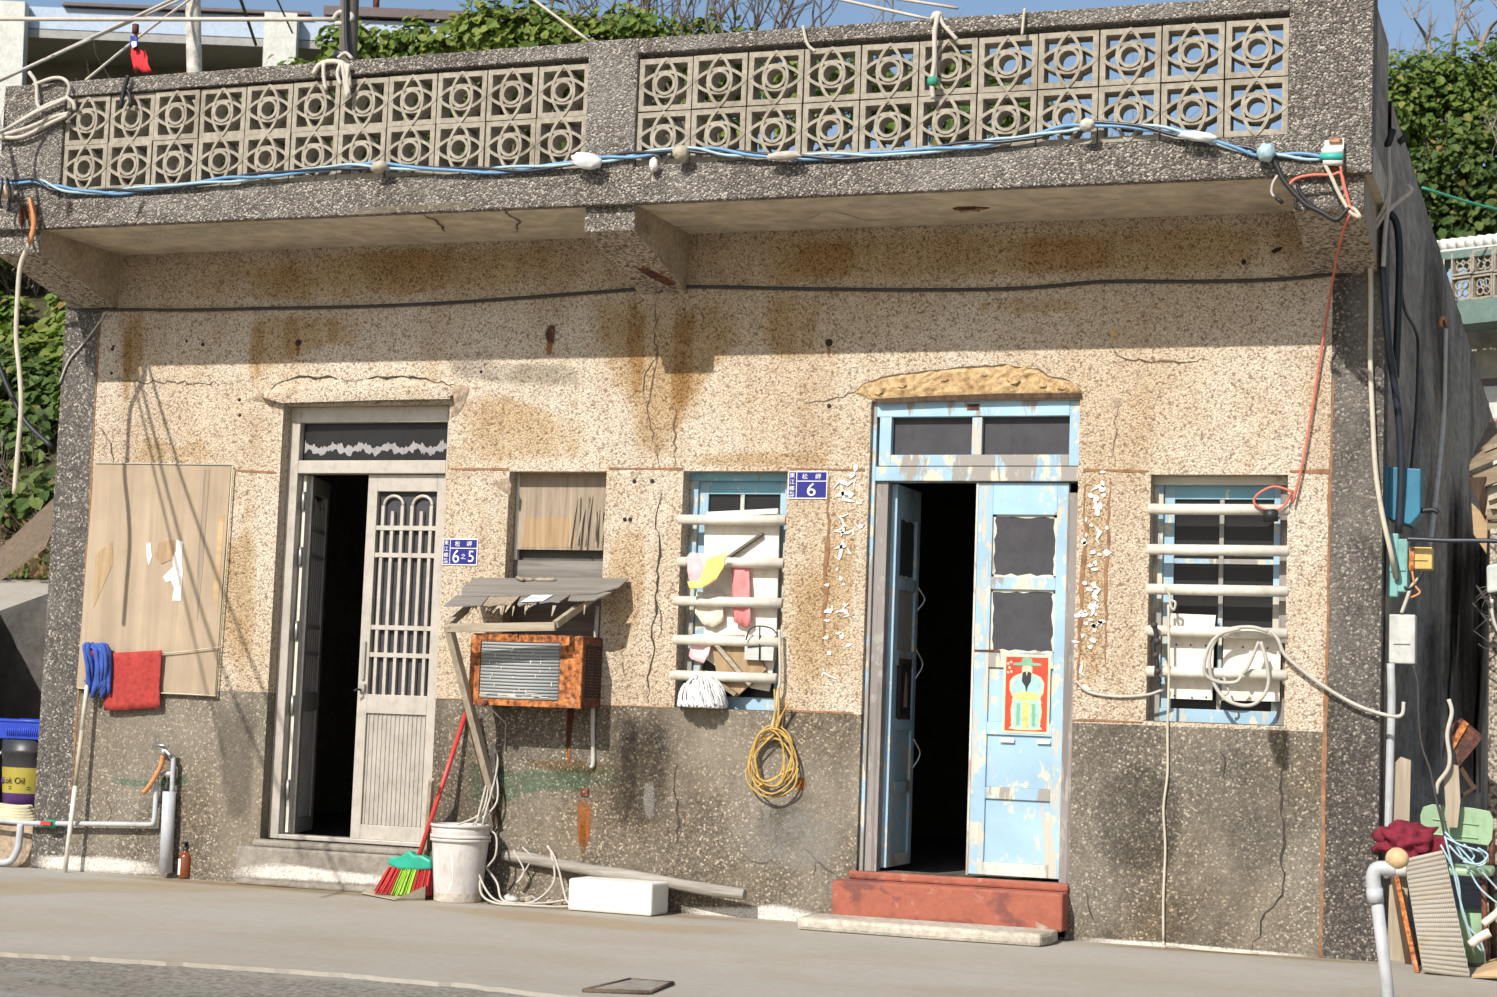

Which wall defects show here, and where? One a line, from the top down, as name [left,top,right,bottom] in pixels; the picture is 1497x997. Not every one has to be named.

rust [545,325,555,355]
crack [643,299,677,702]
peeling [1072,470,1111,690]
crack [672,765,680,844]
crack [1252,731,1288,946]